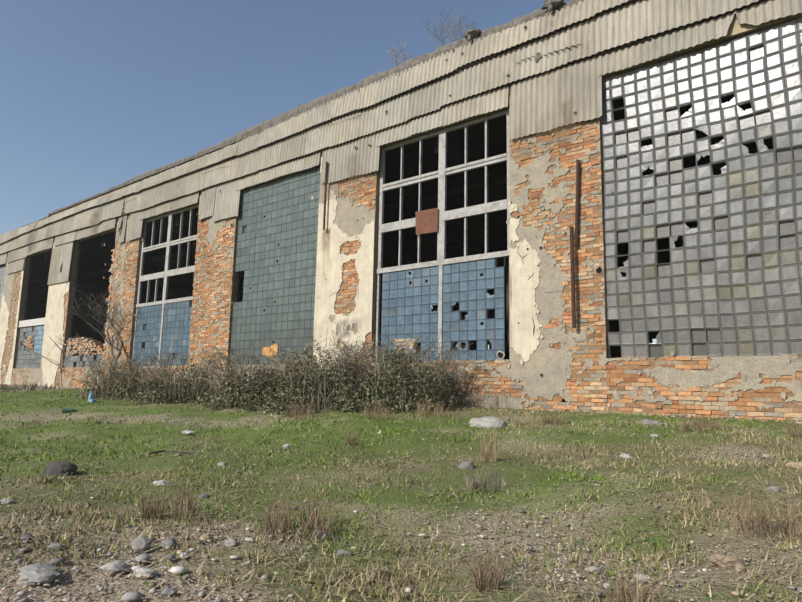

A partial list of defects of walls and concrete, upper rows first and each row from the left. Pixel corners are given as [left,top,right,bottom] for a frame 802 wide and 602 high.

flaking render [312,171,381,373]
corrosion [415,208,438,235]
flaking render [417,117,802,420]